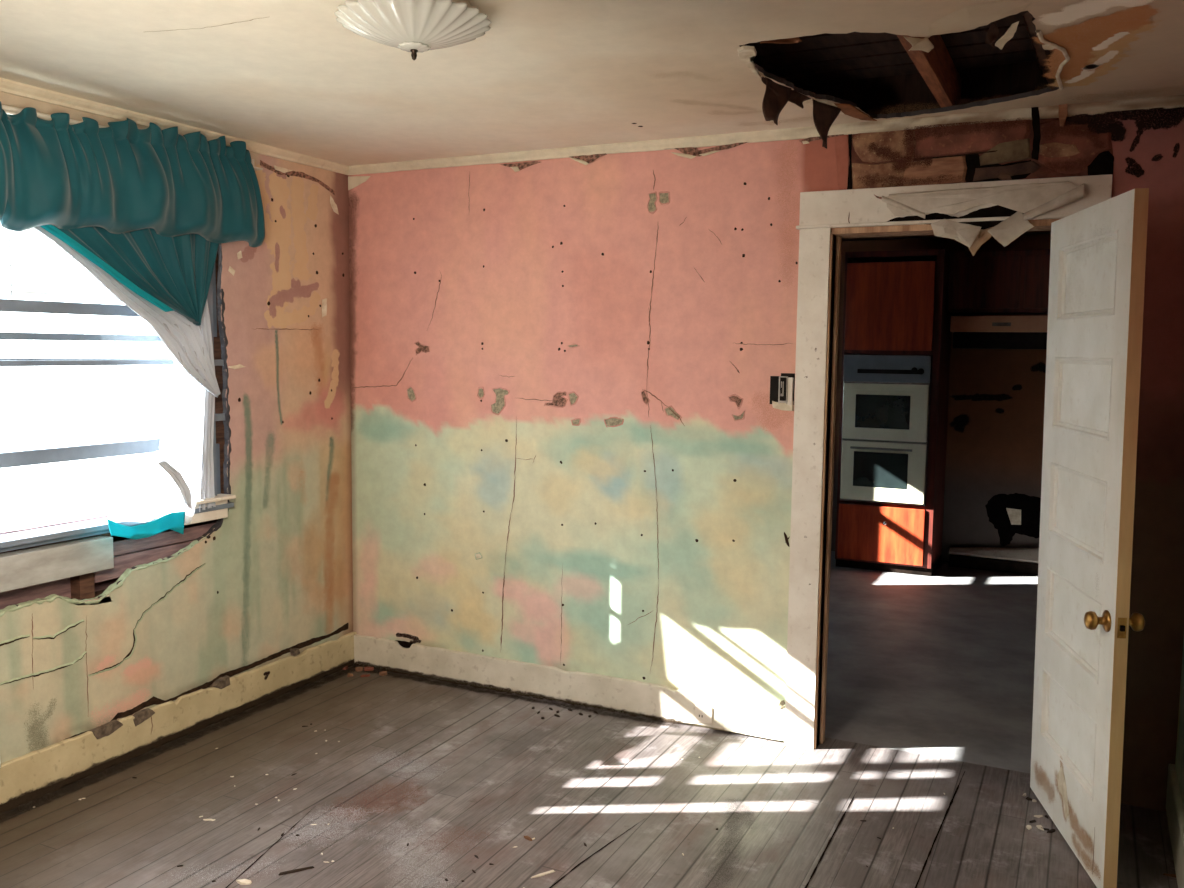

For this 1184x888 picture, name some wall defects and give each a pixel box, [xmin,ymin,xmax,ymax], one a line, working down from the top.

peeling [1031,0,1161,88]
peeling [228,162,339,329]
crack [0,563,206,712]
flaking render [0,518,223,617]
flaking render [217,288,245,502]
water stain [239,330,282,672]
crack [354,358,413,388]
peeling [477,387,510,415]
crack [500,376,557,651]
peeling [544,391,581,426]
crack [628,218,686,671]
spalling [985,493,1041,546]